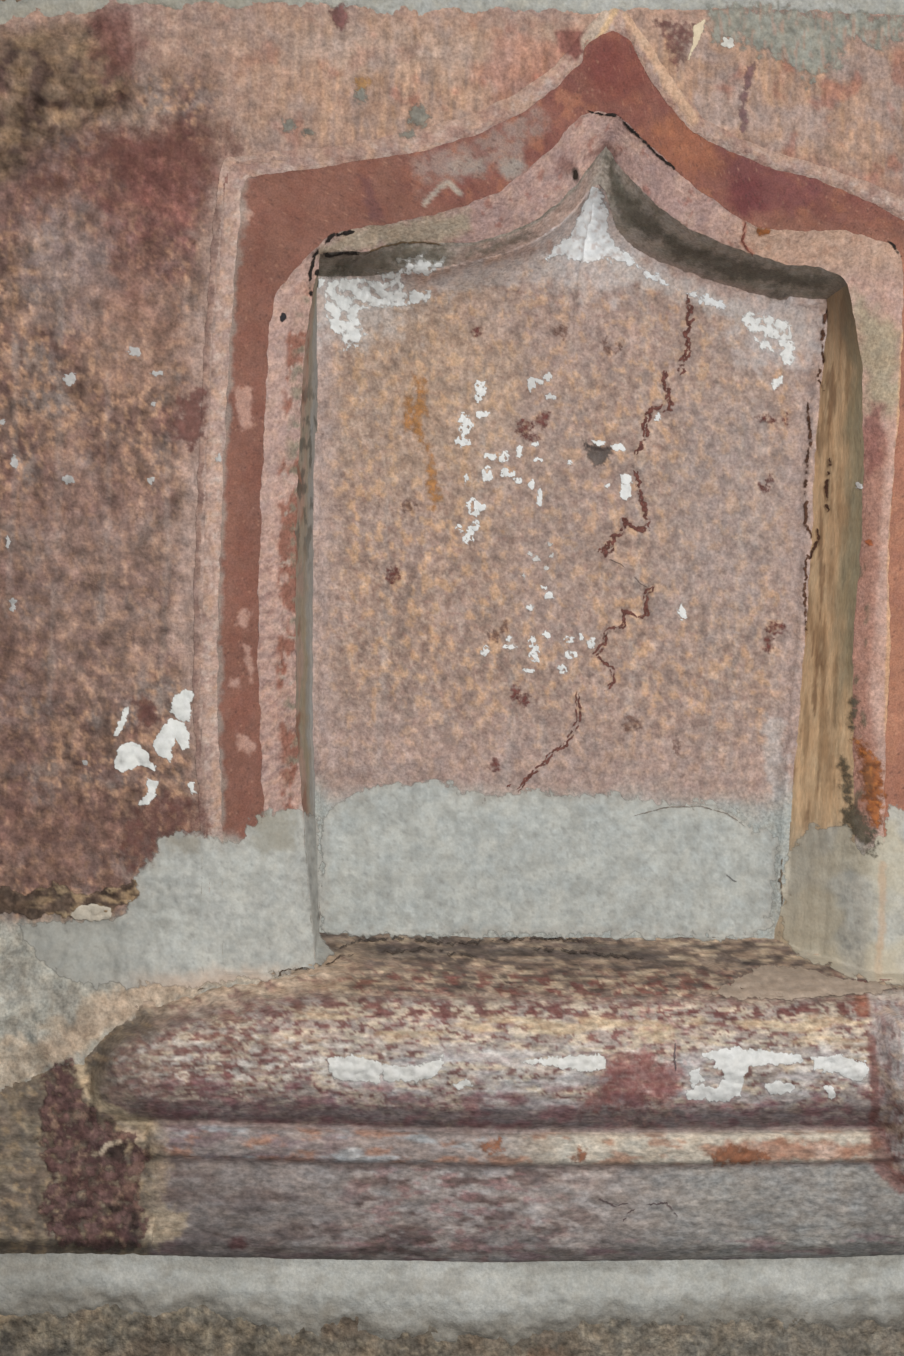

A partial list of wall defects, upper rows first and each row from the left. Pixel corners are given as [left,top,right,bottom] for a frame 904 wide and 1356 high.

peeling [721,37,734,48]
crack [507,294,695,792]
peeling [114,689,194,805]
corrosion [853,738,887,828]
spalling [0,879,140,919]
peeling [686,1046,869,1102]